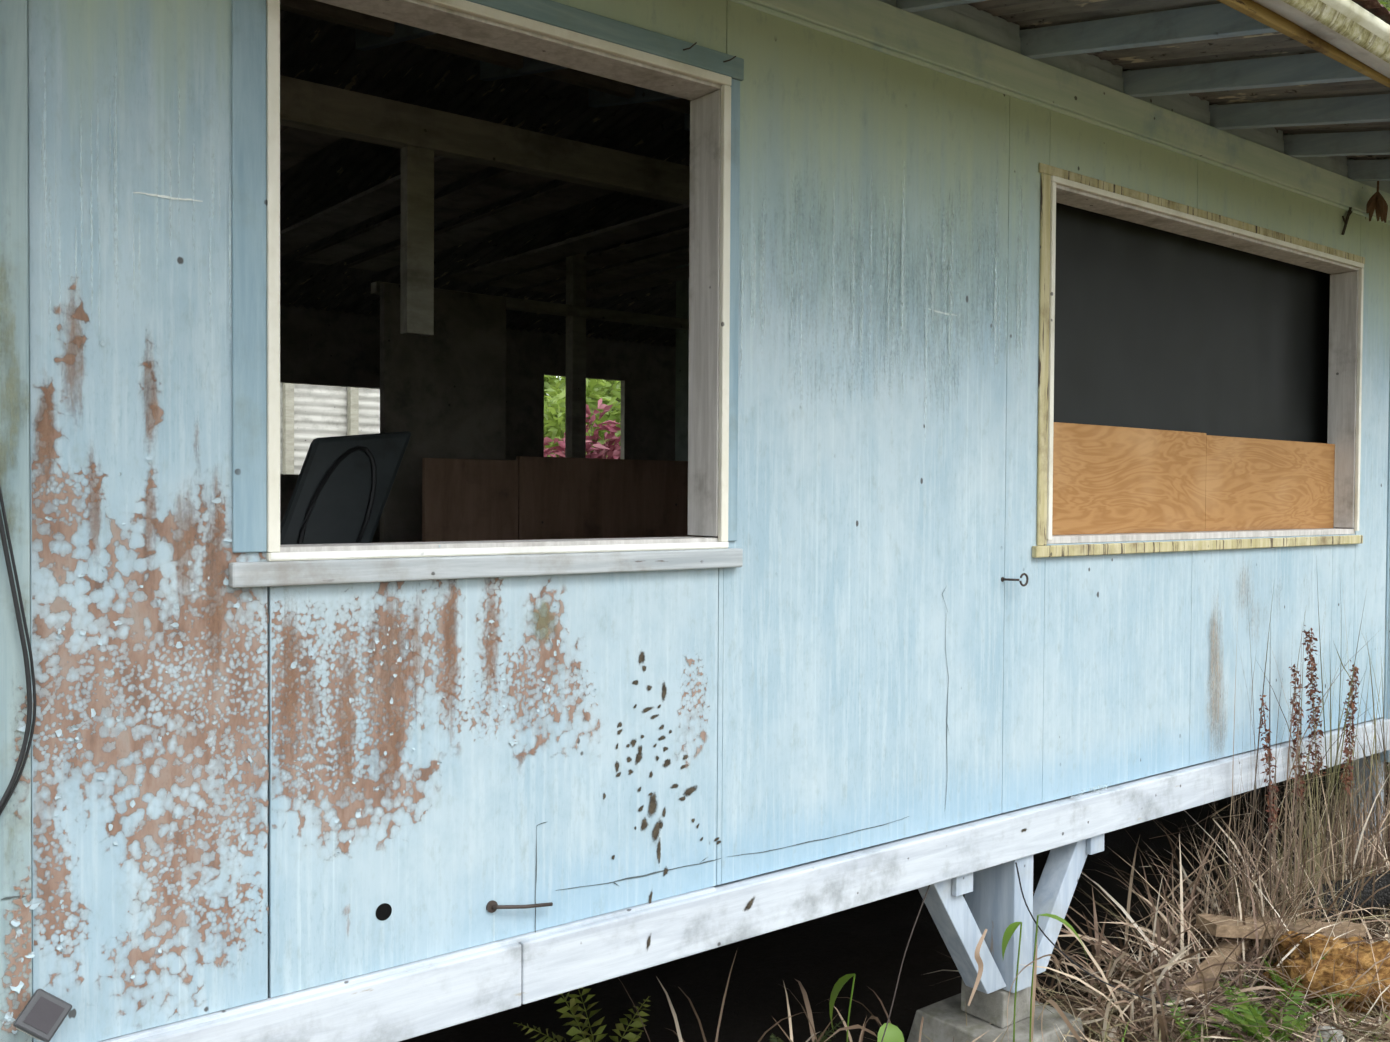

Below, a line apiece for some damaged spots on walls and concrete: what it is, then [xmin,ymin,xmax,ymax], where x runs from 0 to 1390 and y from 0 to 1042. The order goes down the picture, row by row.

peeling [0,281,600,1034]
peeling [678,657,710,764]